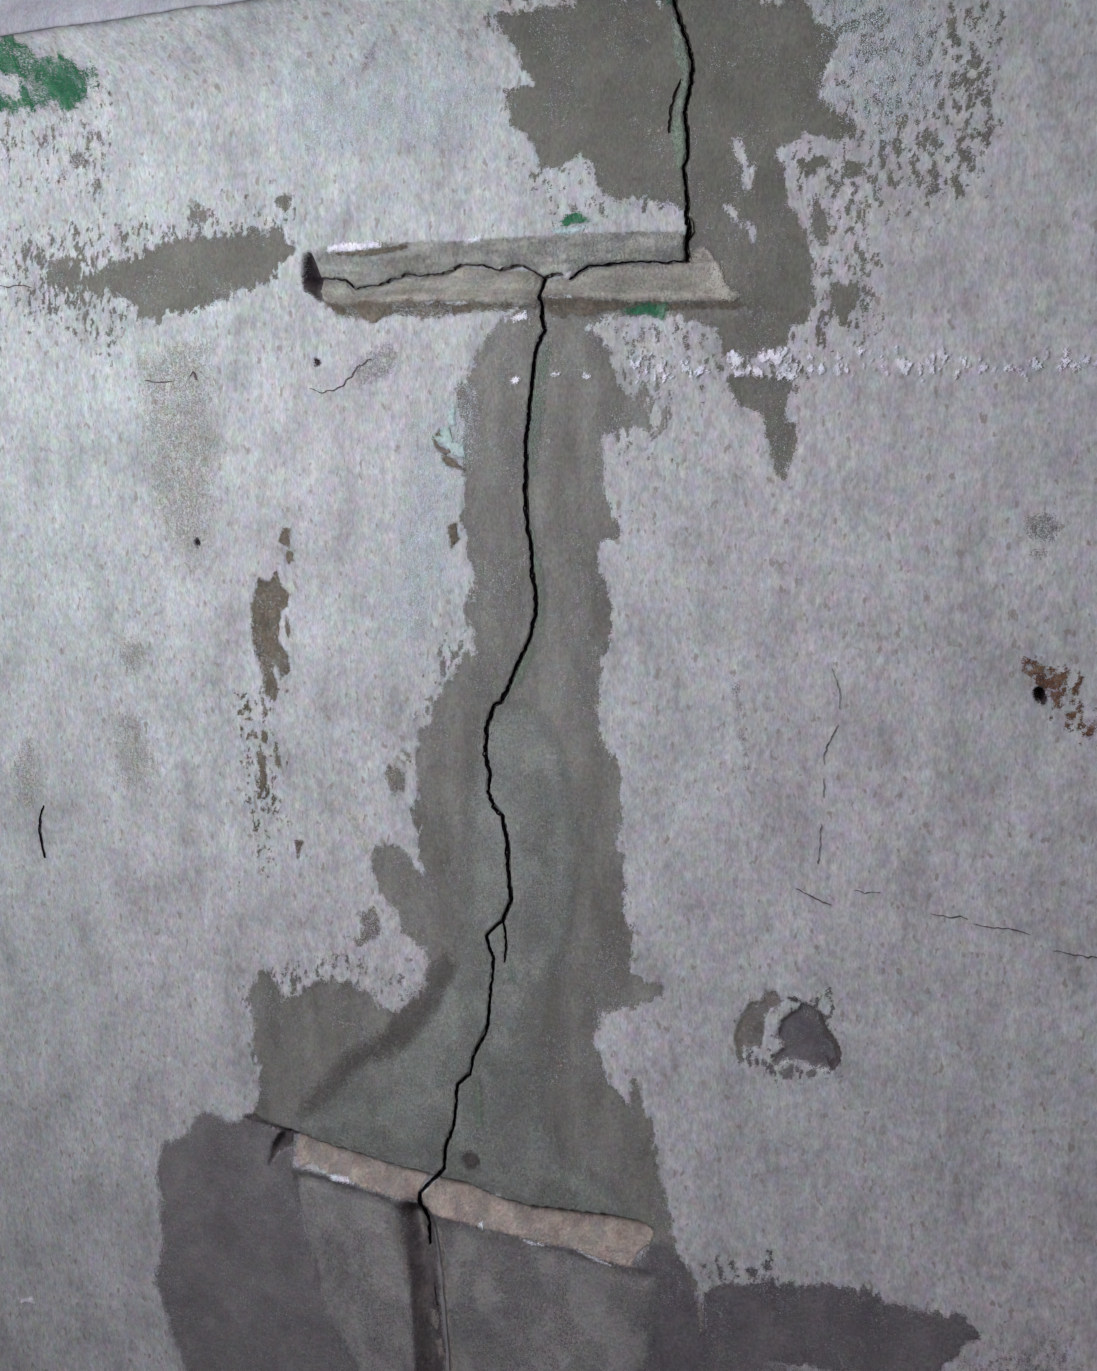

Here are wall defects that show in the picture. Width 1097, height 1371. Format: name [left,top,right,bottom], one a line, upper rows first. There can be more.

flaking render [0,81,297,367]
crack [308,359,371,394]
crack [320,0,694,1245]
flaking render [232,0,1022,1291]
corrosion [1021,655,1097,746]
leakage [152,1111,1080,1371]